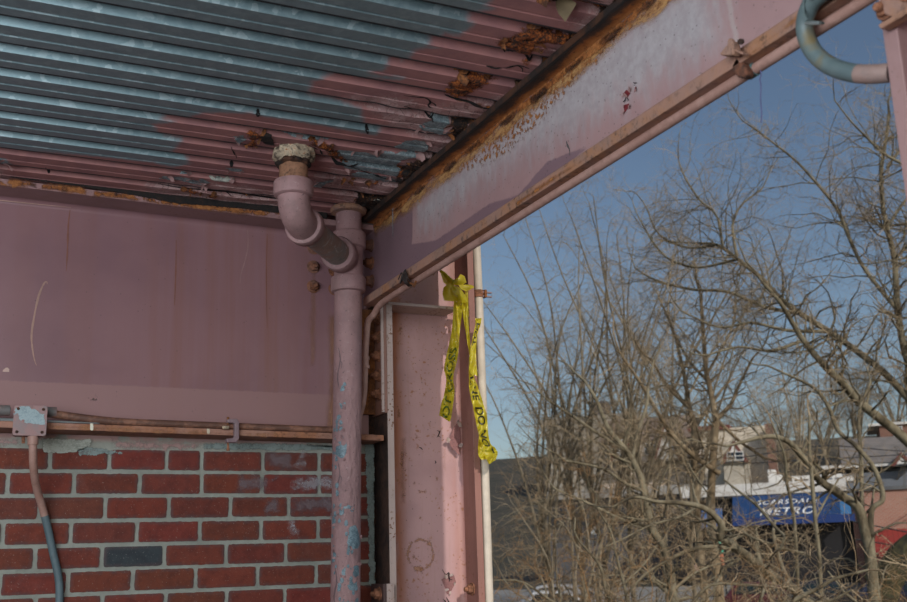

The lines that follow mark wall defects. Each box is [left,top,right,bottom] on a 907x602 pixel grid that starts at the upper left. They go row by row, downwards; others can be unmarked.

rust [0,180,279,216]
rust [244,129,274,149]
rust [308,136,436,217]
peeling [337,113,453,187]
rust [373,0,671,232]
peeling [330,482,362,602]